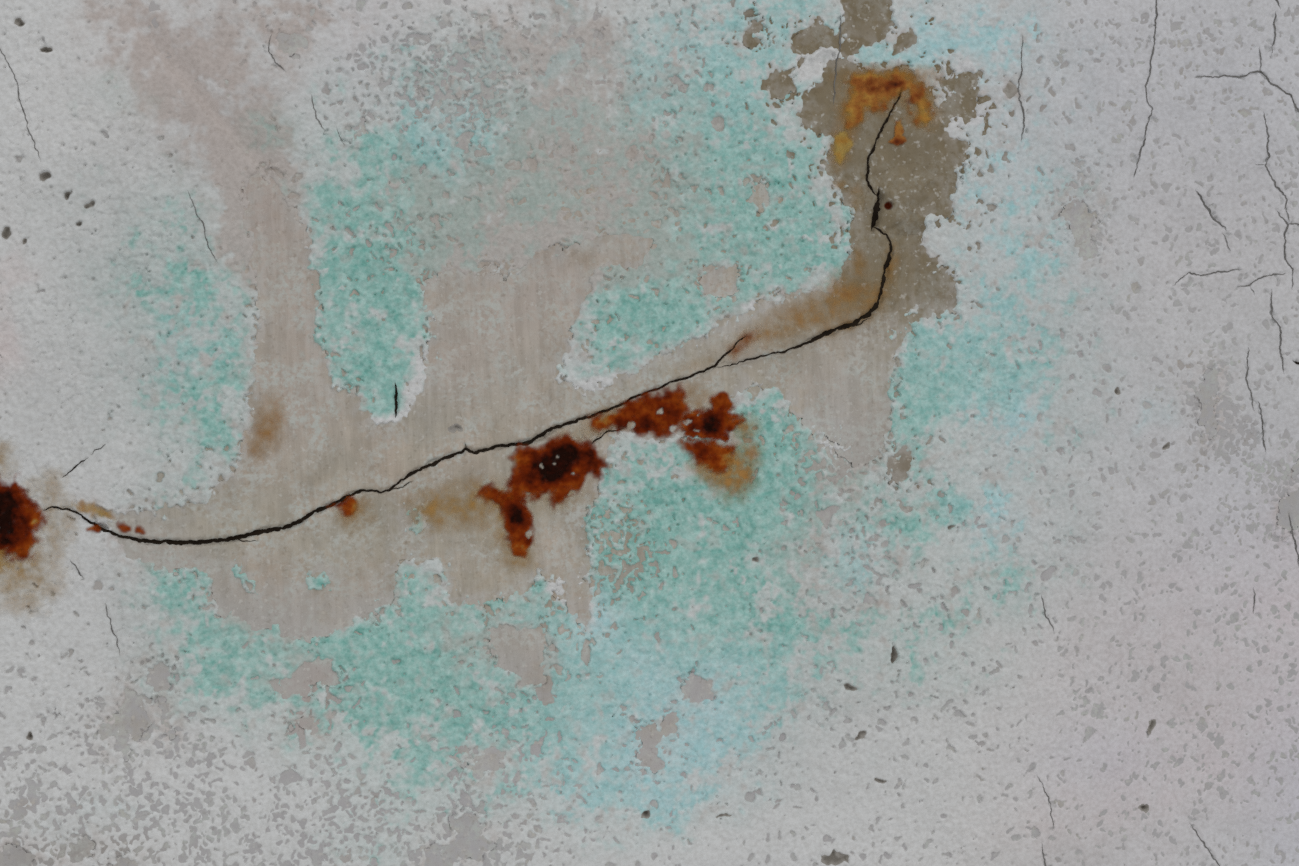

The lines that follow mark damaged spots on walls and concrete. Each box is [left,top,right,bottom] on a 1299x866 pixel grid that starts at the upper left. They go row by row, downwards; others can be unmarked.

rust [834,69,932,163]
crack [1175,0,1299,452]
crack [46,92,901,545]
flaking render [95,0,983,699]
rust [0,482,46,588]
rust [79,503,145,534]
rust [422,386,757,563]